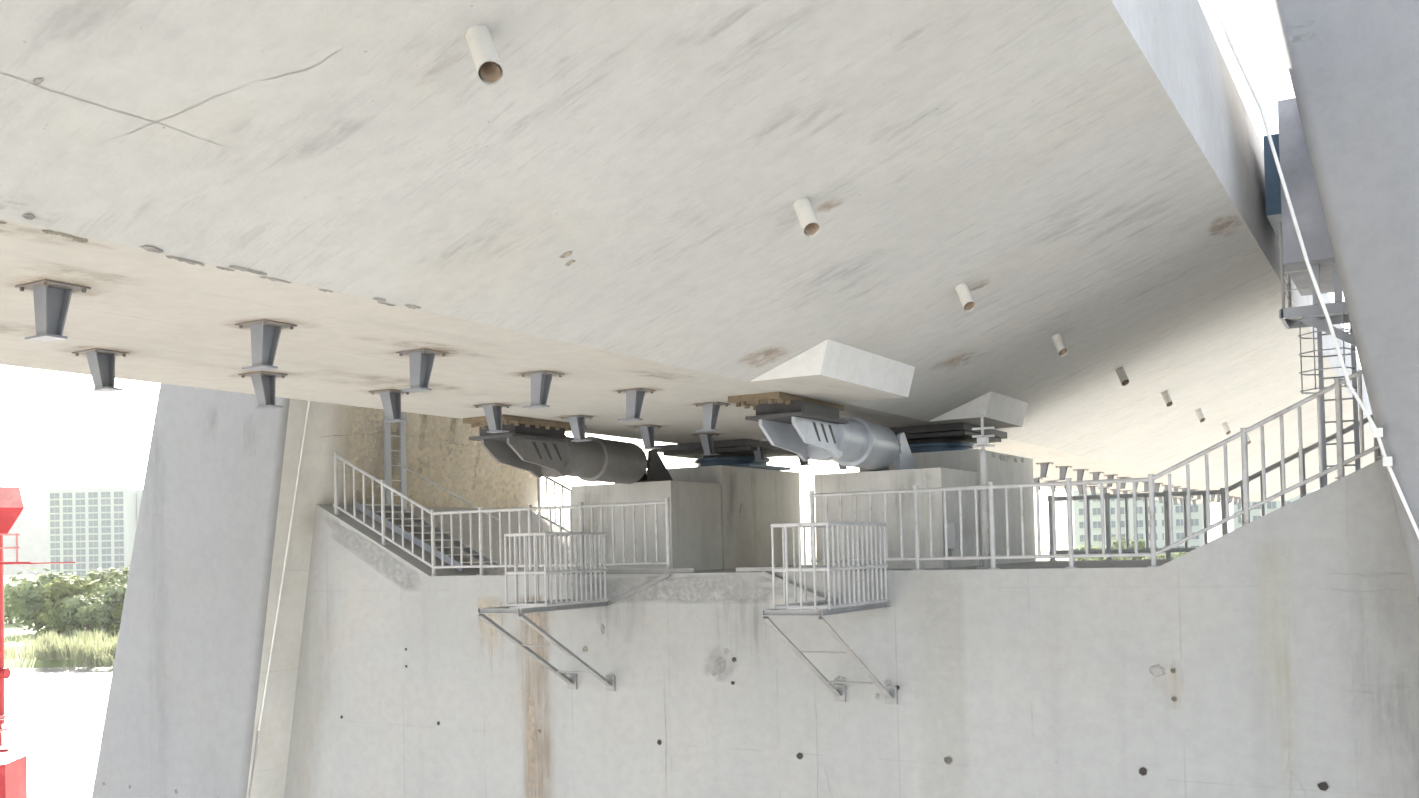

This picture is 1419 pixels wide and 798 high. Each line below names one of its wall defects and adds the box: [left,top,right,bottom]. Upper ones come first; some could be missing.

crack [0,49,342,147]
spalling [23,213,88,243]